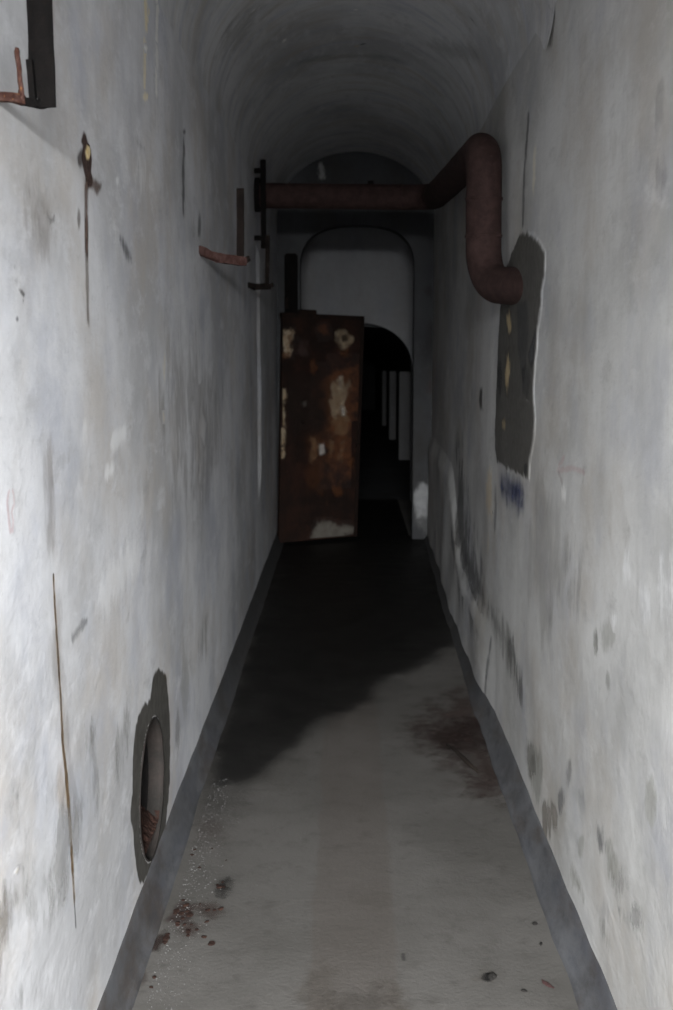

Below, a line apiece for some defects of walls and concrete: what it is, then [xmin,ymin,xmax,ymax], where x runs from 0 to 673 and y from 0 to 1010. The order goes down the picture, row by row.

rust [78,126,100,255]
rust [310,353,360,490]
peeling [495,225,547,485]
crack [53,573,74,874]
peeling [130,664,171,889]
leakage [197,499,458,808]